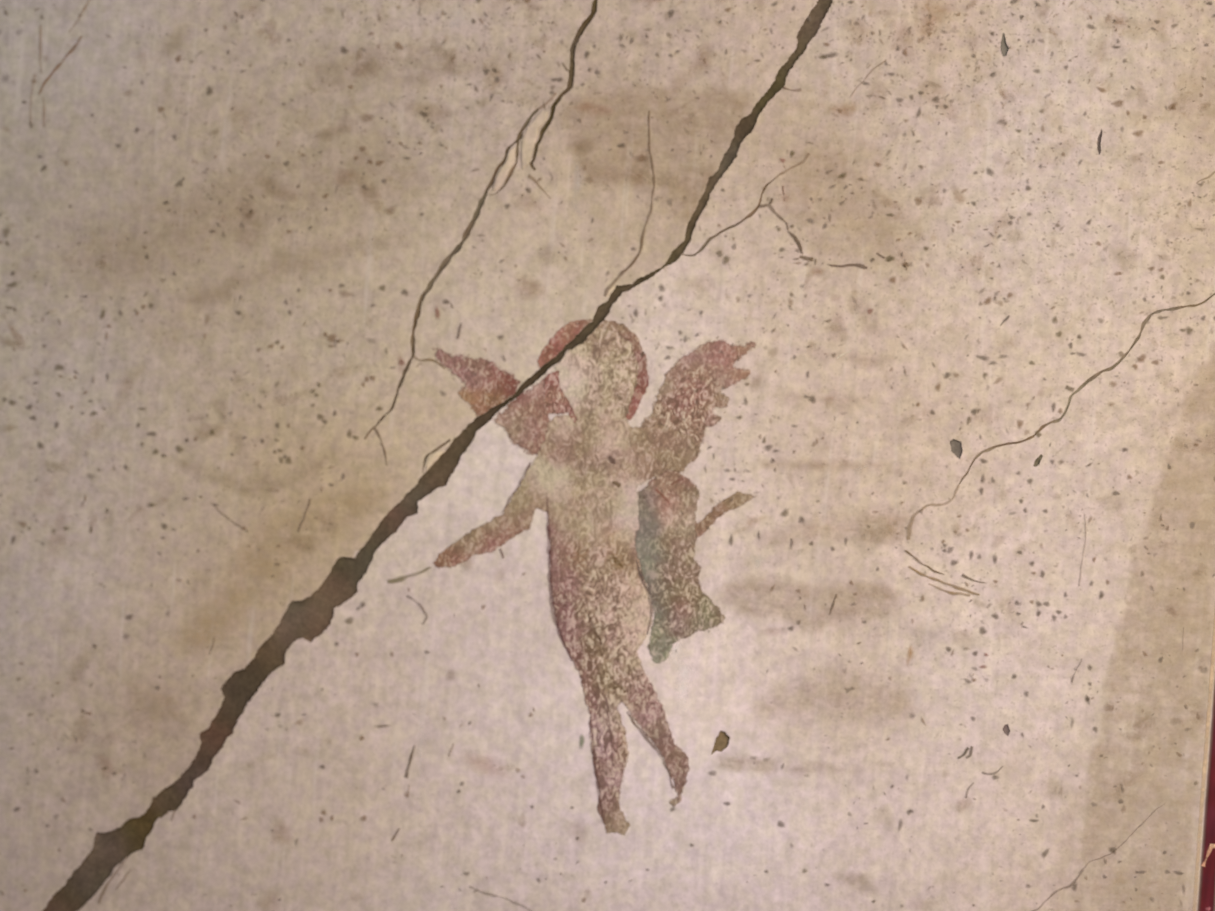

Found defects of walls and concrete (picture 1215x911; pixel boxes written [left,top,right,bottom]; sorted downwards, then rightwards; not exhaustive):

crack [43,0,885,911]
crack [907,293,1215,540]